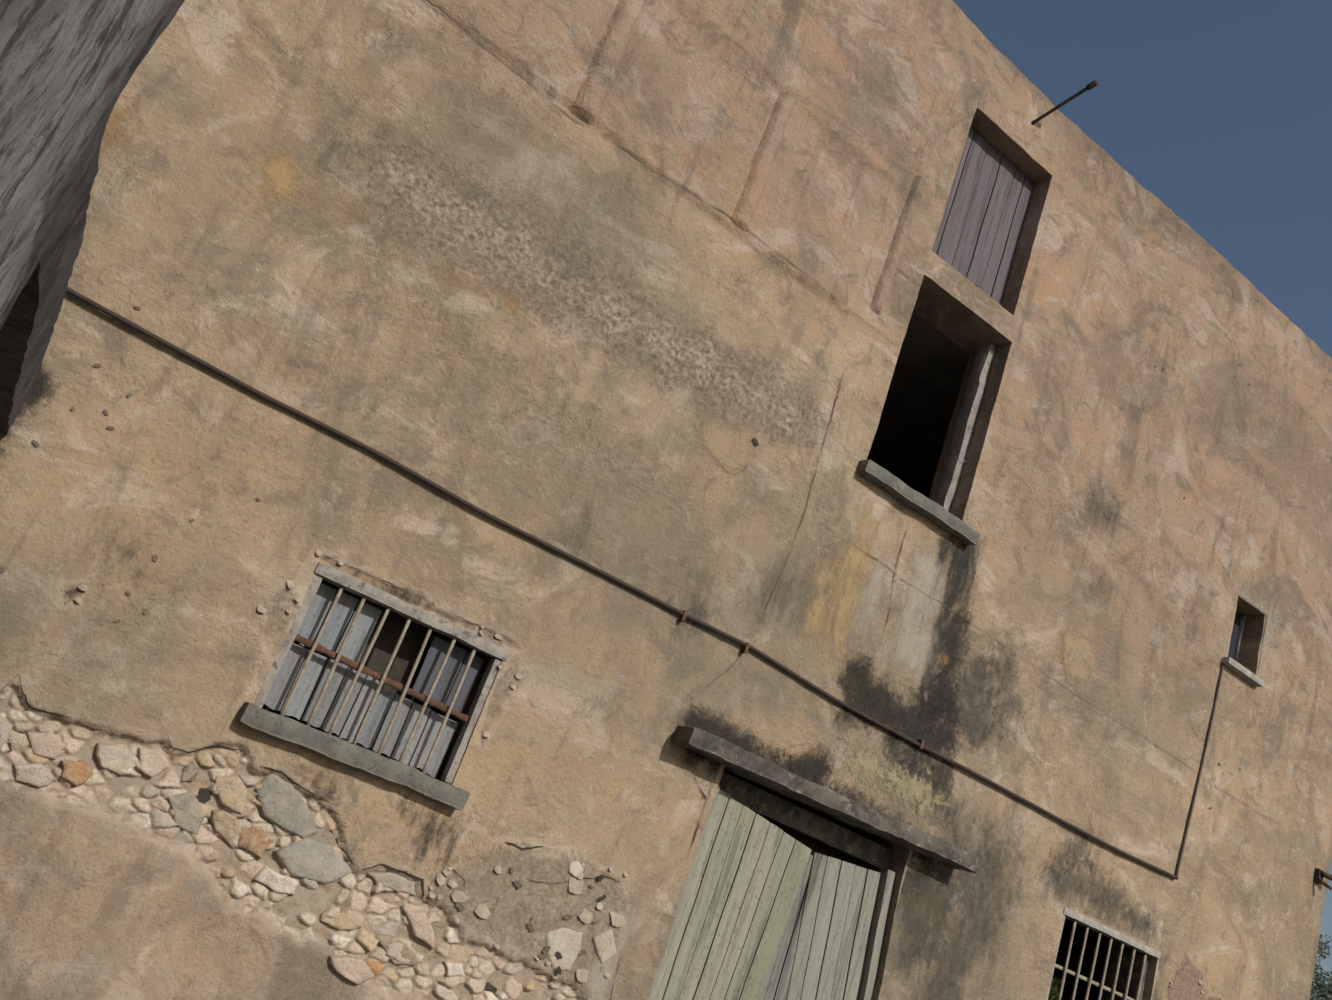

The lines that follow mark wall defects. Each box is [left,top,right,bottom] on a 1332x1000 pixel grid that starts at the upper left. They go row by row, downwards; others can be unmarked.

water stain [9,368,55,435]
spalling [0,683,628,1000]
water stain [678,708,881,812]
water stain [799,512,1016,1000]